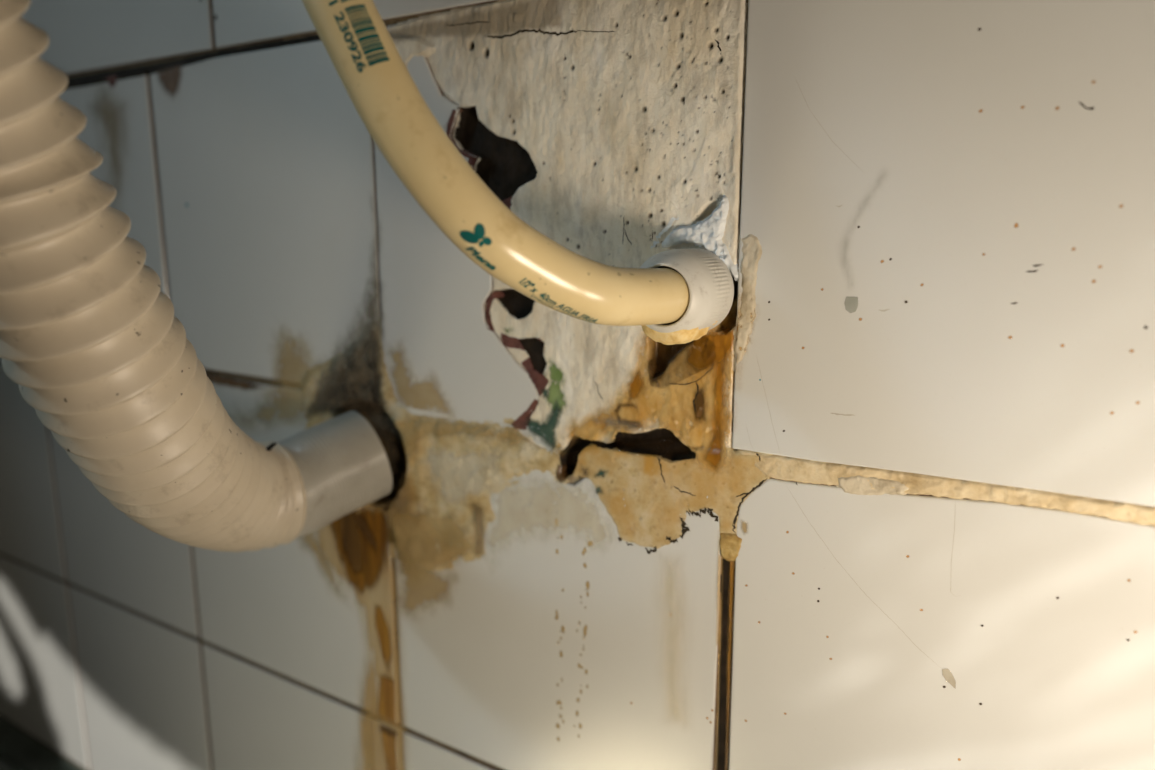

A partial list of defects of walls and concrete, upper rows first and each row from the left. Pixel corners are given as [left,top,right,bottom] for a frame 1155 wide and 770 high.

crack [445,21,616,39]
spalling [386,0,747,335]
water stain [206,372,258,389]
water stain [257,241,403,487]
water stain [393,352,448,411]
spalling [302,277,773,573]
rust [557,326,742,468]
rust [320,508,405,770]
rust [555,610,588,741]